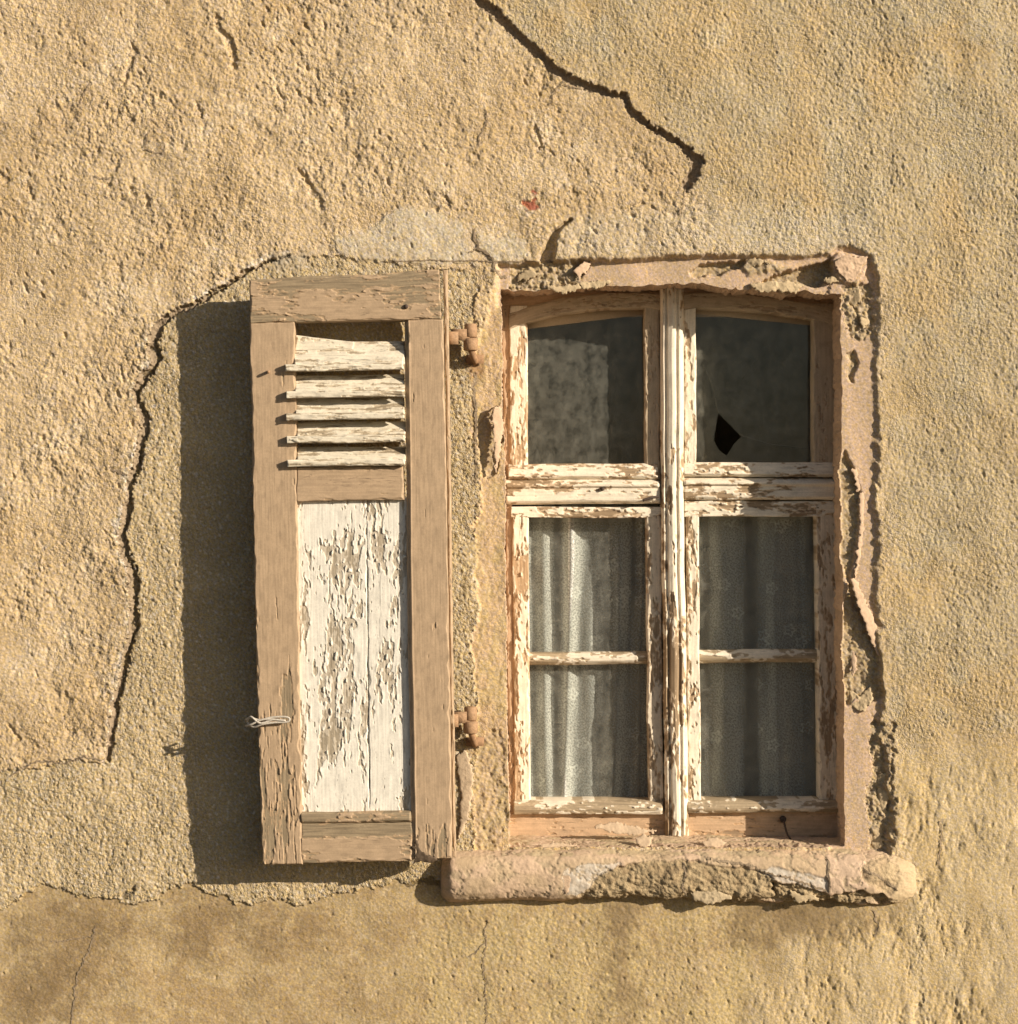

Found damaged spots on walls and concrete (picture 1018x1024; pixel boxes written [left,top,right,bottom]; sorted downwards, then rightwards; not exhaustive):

crack [12,254,290,775]
spalling [0,255,926,1024]
spalling [509,218,611,294]
crack [474,0,706,214]